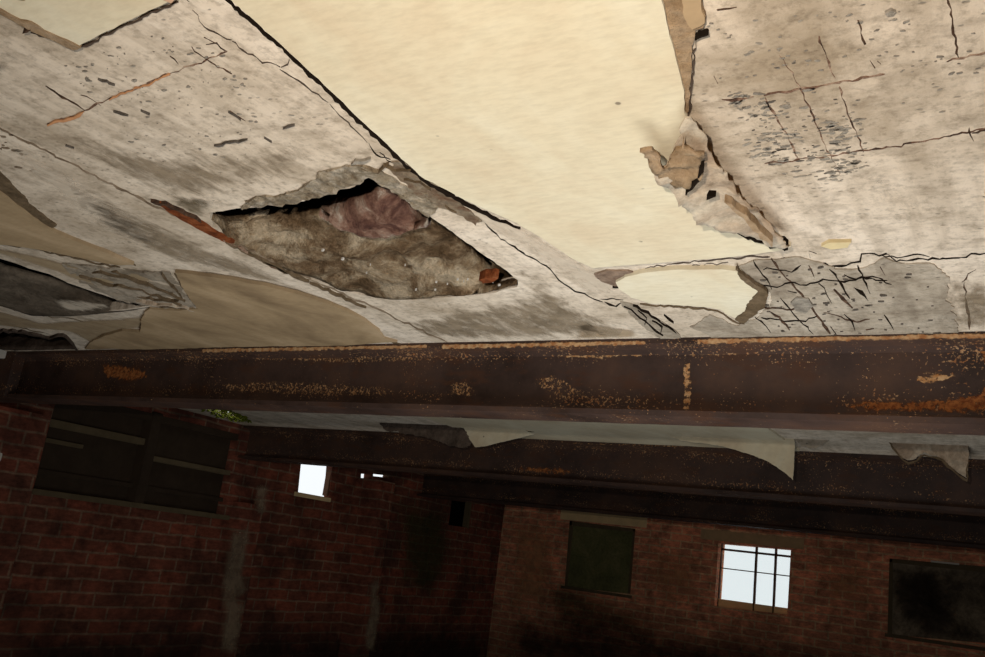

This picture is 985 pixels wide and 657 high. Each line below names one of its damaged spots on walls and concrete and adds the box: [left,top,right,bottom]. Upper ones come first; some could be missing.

rust [150,199,279,271]
spalling [212,156,518,300]
spalling [0,259,196,312]
crack [85,289,140,305]
spalling [594,269,633,288]
crack [645,255,785,269]
spalling [690,256,959,338]
crack [809,251,985,267]
spalling [620,301,681,339]
rust [683,269,985,409]
rust [104,365,147,380]
rust [850,388,985,413]